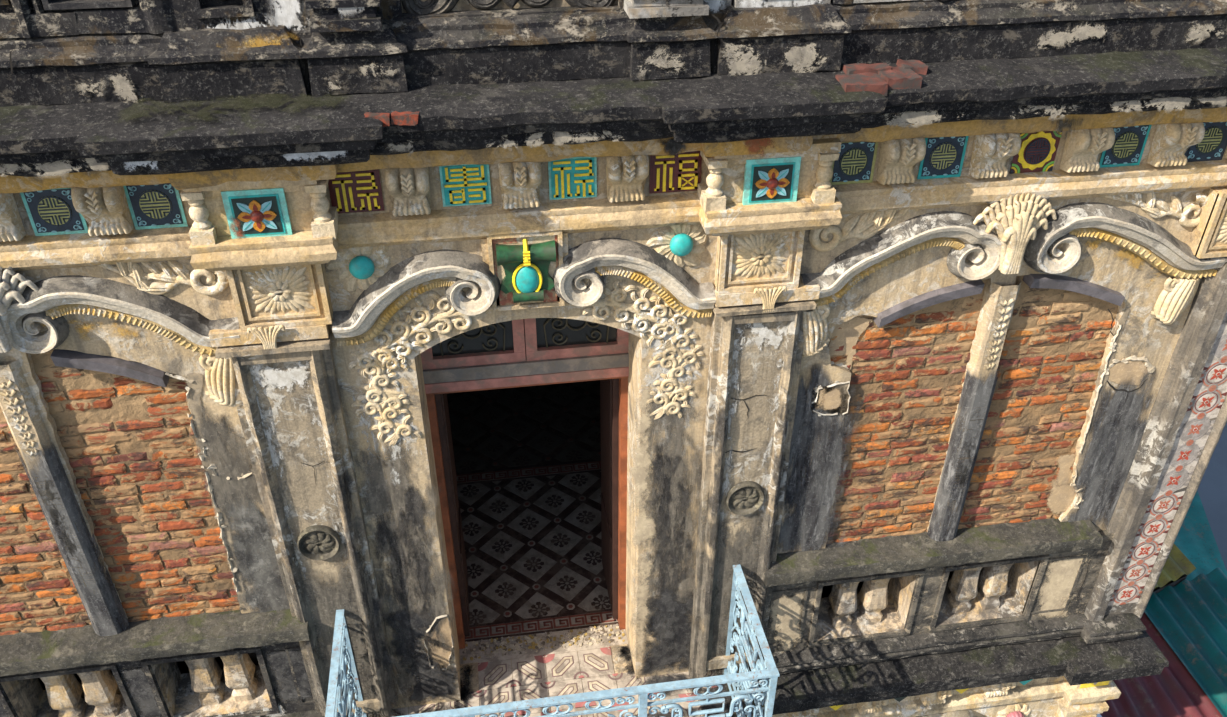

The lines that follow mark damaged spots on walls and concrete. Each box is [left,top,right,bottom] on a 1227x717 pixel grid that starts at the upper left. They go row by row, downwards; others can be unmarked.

flaking render [165,371,254,610]